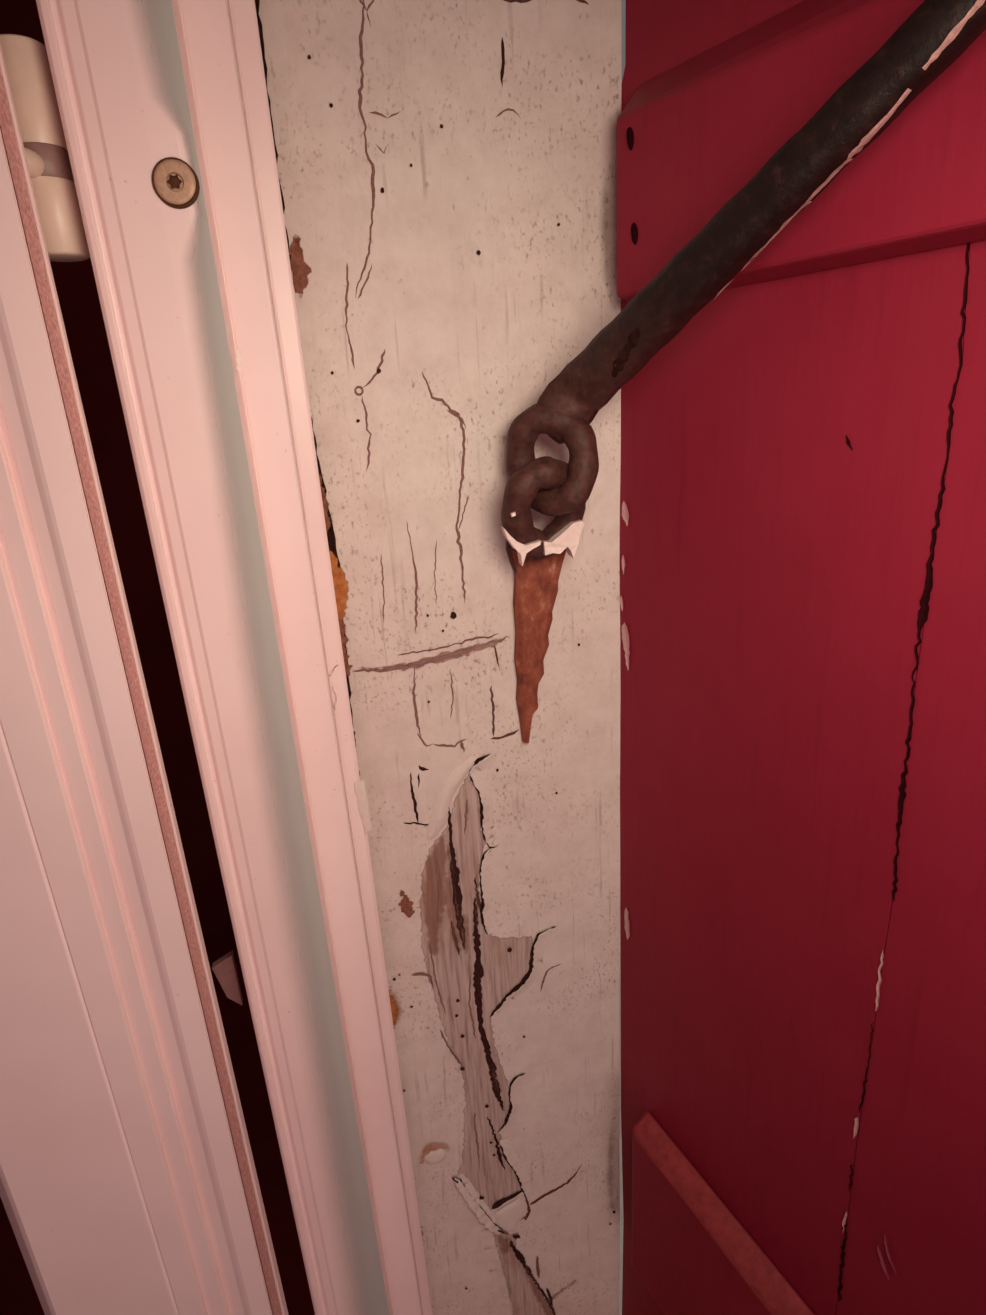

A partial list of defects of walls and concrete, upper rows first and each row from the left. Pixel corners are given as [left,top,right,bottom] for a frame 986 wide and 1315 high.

crack [496,38,520,117]
crack [504,0,531,8]
crack [345,0,399,471]
corrosion [329,551,352,676]
crack [380,372,469,630]
crack [892,243,970,901]
crack [405,647,519,826]
peeling [399,754,560,1315]
crack [859,1023,874,1111]
crack [837,1224,847,1301]